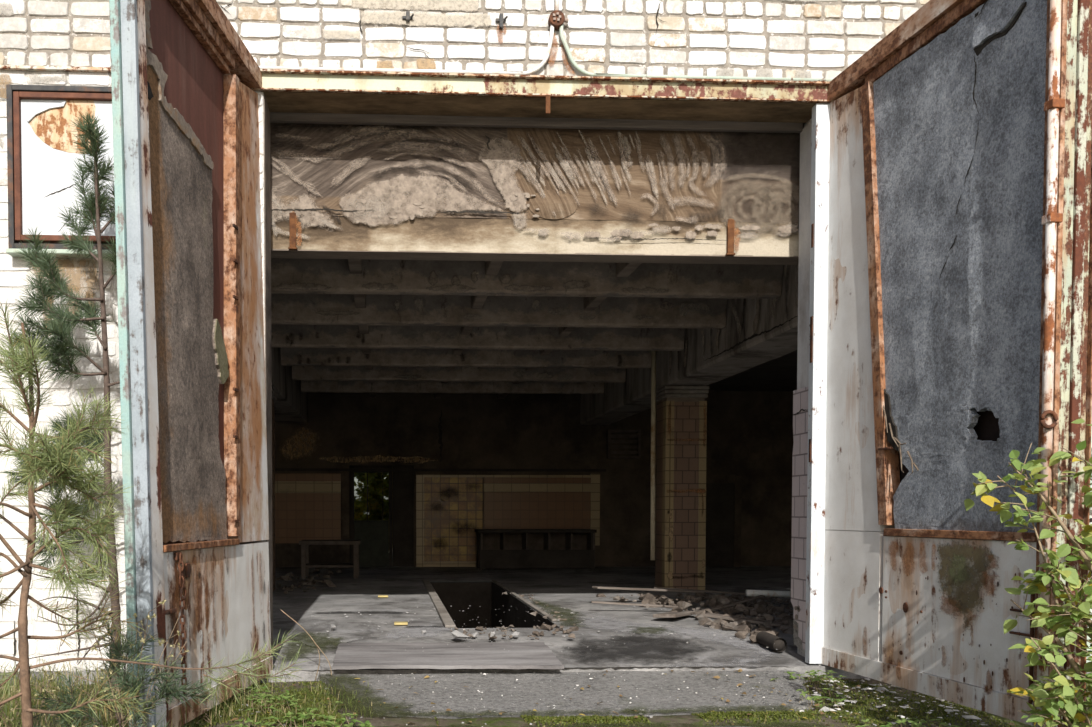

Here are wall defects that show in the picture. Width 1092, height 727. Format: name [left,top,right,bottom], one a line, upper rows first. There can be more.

spalling [339,137,549,235]
crack [939,57,979,279]
peeling [562,223,722,240]
peeling [739,225,760,238]
peeling [777,224,799,236]
corrosion [175,555,224,661]
corrosion [251,554,270,639]
corrosion [889,541,936,574]